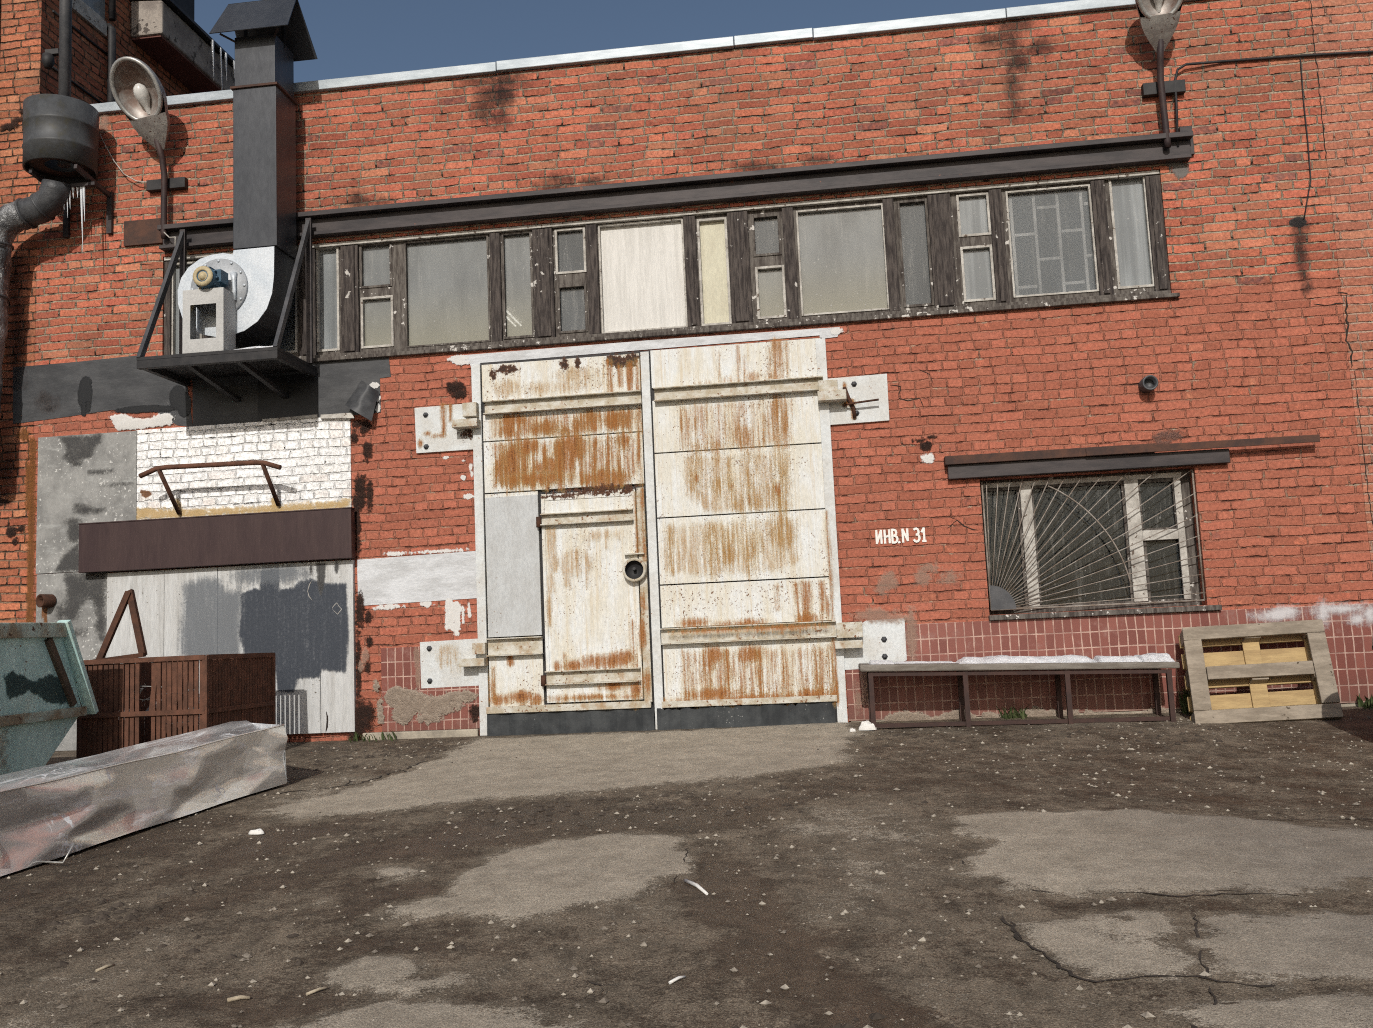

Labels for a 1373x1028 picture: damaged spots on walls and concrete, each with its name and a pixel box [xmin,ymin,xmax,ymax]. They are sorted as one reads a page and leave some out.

leakage [1294,220,1310,289]
corrosion [489,364,521,393]
corrosion [559,352,641,392]
corrosion [492,408,646,561]
corrosion [669,338,794,574]
corrosion [488,511,839,706]
crack [1120,890,1293,898]
crack [1001,915,1321,987]